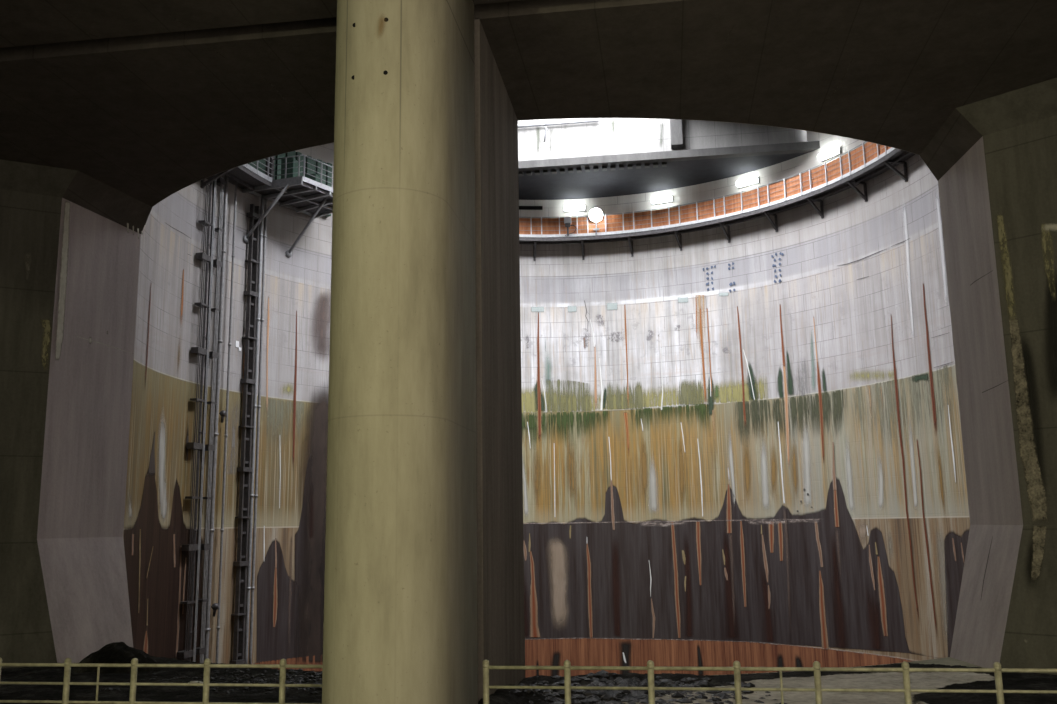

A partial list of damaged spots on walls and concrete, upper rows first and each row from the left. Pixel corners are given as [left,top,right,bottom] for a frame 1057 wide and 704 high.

leakage [124,424,203,663]
leakage [257,392,329,663]
rust [696,295,712,400]
rust [523,512,912,678]
leakage [523,422,923,660]
rust [722,469,746,607]
rust [737,306,746,423]
rust [771,305,797,490]
rust [891,318,919,616]
rust [923,284,937,429]
leakage [997,216,1047,579]
leakage [1042,224,1057,391]